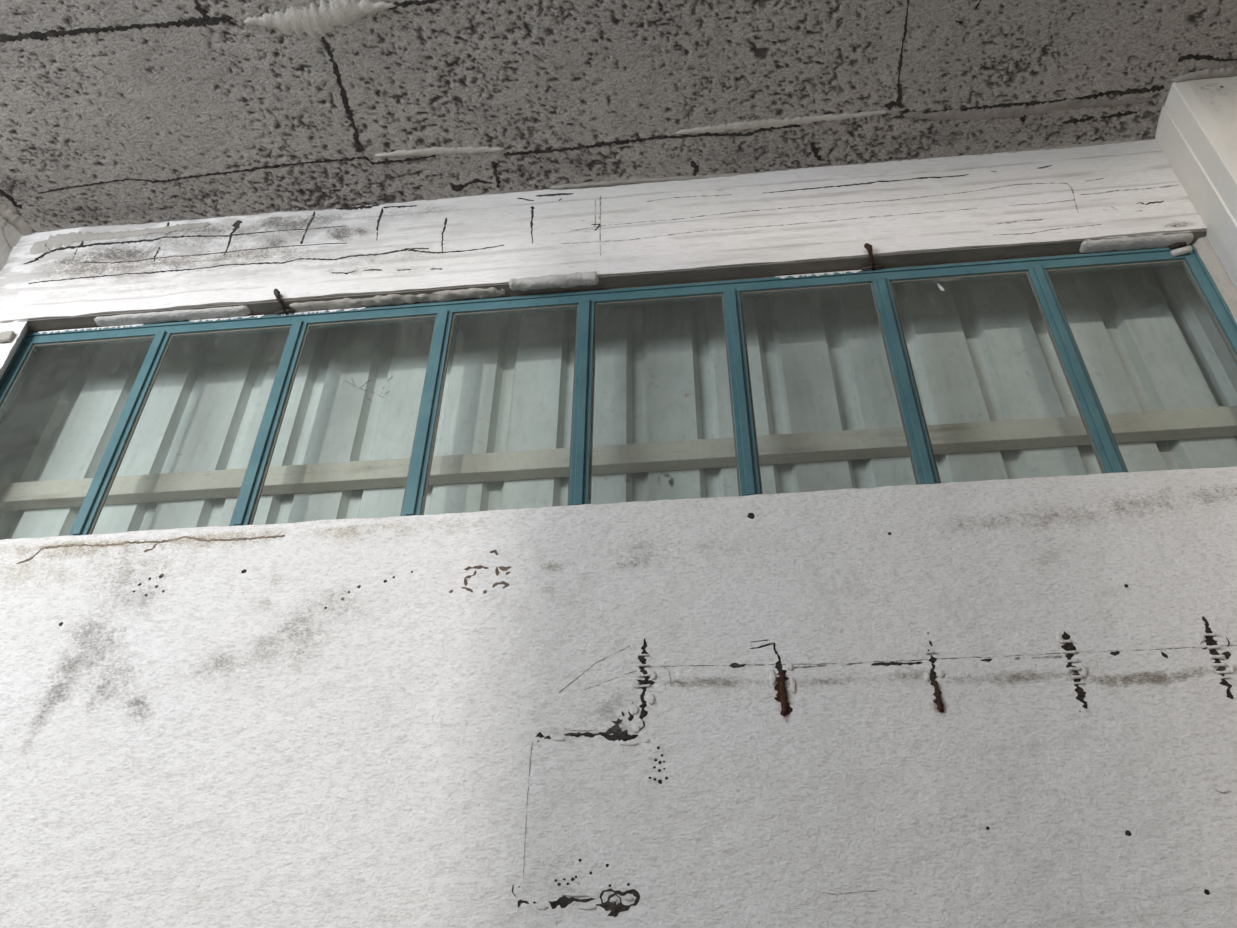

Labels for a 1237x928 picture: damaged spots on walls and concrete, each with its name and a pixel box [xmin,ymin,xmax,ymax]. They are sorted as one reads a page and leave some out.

crack [1178,54,1237,88]
crack [884,101,904,110]
crack [1062,110,1138,124]
crack [0,189,22,209]
crack [24,142,1174,284]
leakage [40,541,125,556]
crack [1110,647,1195,658]
crack [664,652,1080,676]